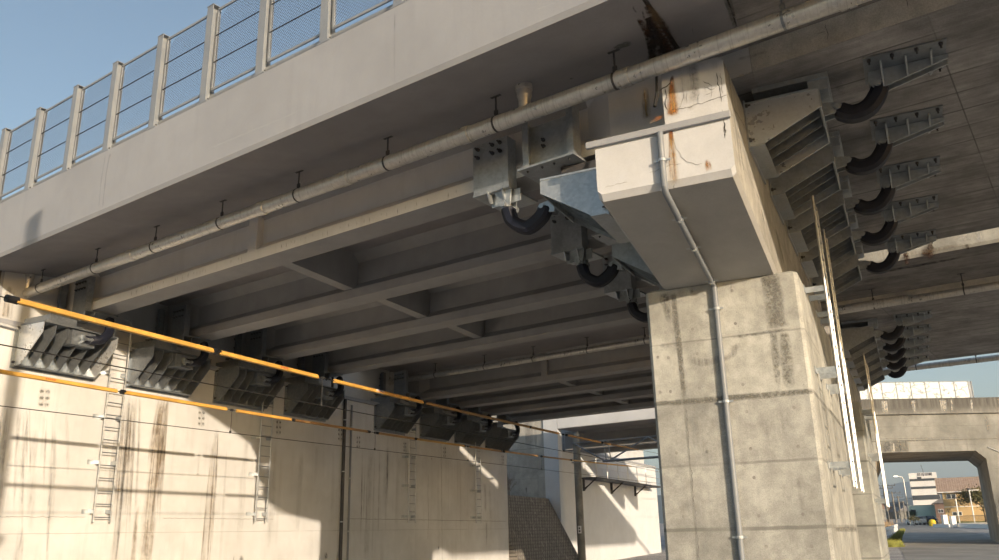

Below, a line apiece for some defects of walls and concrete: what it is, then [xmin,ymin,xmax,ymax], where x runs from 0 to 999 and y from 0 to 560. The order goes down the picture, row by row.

leakage [633,1,675,59]
rust [644,78,676,120]
crack [661,73,746,136]
leakage [661,296,684,385]
leakage [762,275,791,383]